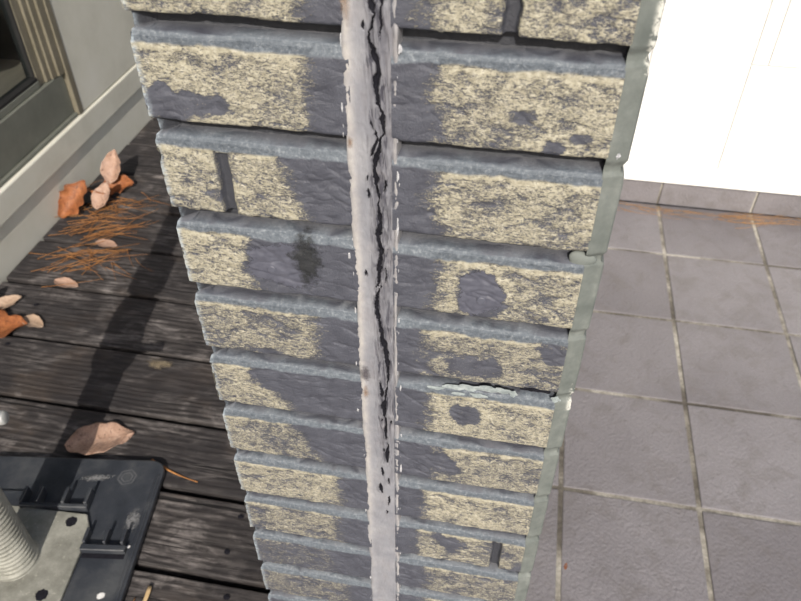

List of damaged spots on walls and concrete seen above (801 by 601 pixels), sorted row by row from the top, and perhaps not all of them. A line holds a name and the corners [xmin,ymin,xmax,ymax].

leakage [287,228,321,283]
crack [361,0,392,514]